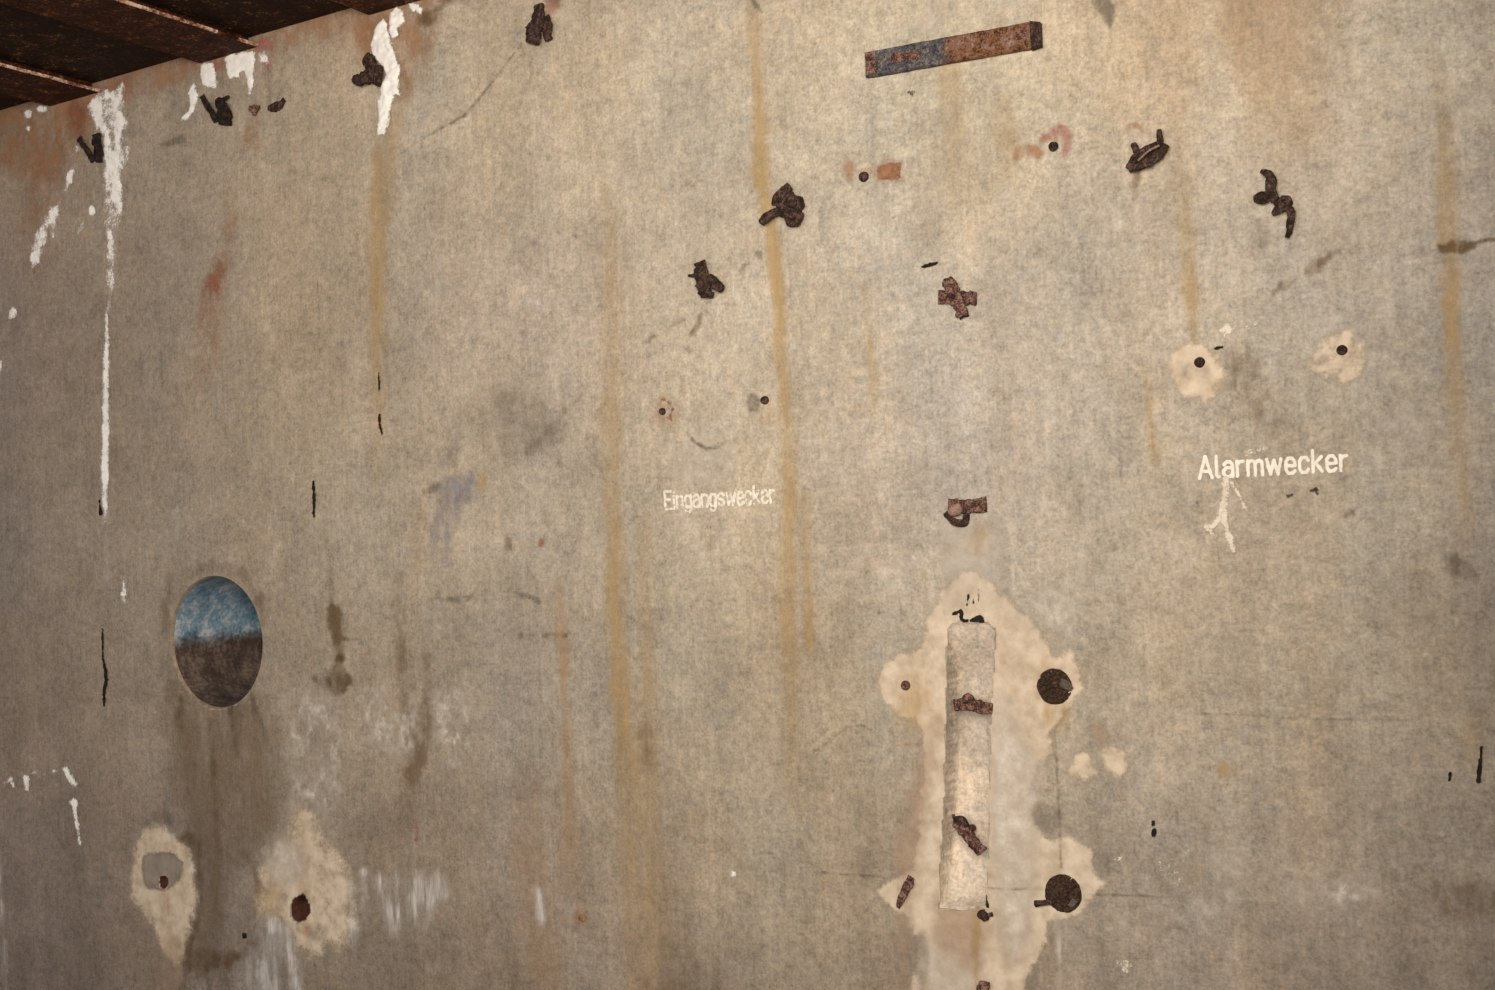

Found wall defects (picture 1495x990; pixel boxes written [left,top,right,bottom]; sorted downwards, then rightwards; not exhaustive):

water stain [25,105,47,131]
corrosion [267,98,286,112]
water stain [30,146,78,266]
water stain [4,767,81,845]
spalling [291,894,311,922]